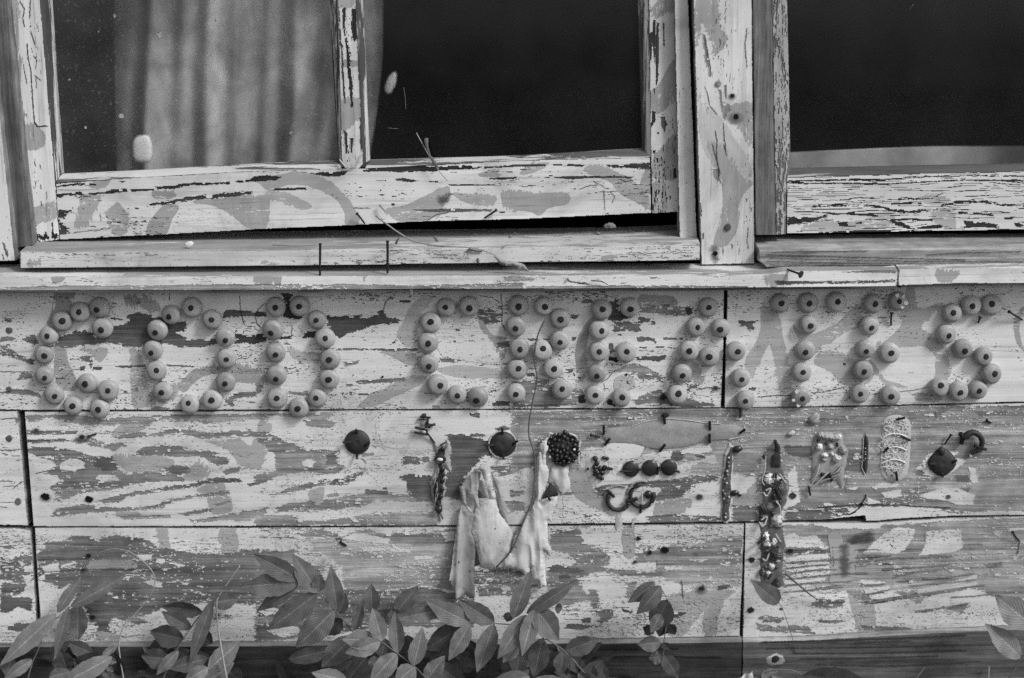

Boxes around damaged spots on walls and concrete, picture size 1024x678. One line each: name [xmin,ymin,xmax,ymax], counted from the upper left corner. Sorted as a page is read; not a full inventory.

peeling [339,6,357,108]
peeling [649,18,666,95]
peeling [702,34,713,78]
peeling [344,118,362,154]
peeling [651,111,667,134]
peeling [718,85,730,121]
peeling [37,175,307,242]
peeling [311,171,356,185]
peeling [363,150,658,191]
peeling [787,175,1024,233]
peeling [0,283,524,367]
peeling [0,299,1024,641]